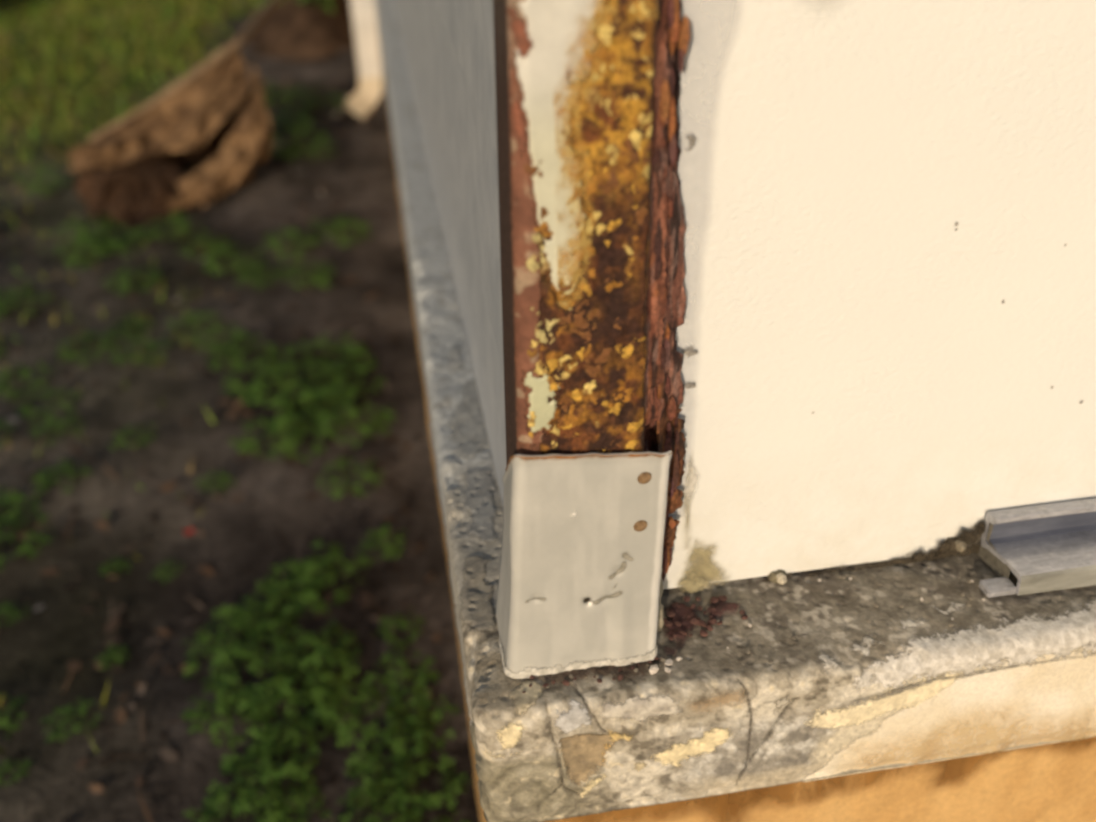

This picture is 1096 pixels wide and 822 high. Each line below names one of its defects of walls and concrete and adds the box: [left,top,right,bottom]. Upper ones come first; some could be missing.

peeling [507,0,544,444]
corrosion [506,0,690,581]
peeling [448,378,658,758]
corrosion [665,600,739,655]